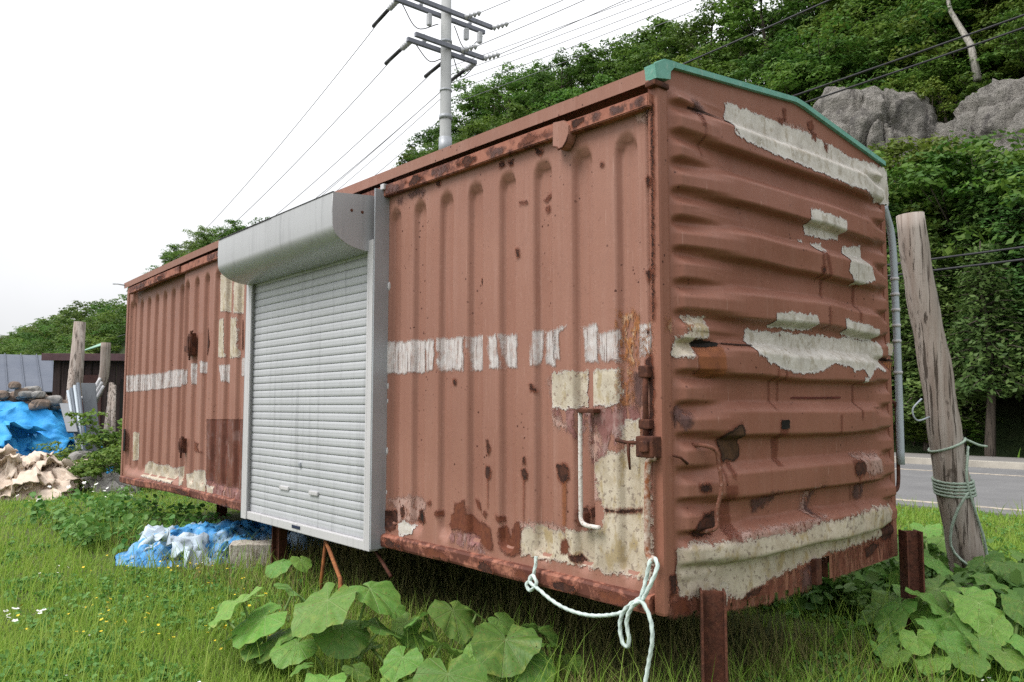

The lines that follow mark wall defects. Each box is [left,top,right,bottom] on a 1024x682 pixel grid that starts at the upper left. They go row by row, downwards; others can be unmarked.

peeling [724,102,889,206]
rust [592,96,656,436]
peeling [798,208,875,286]
peeling [666,315,710,359]
peeling [743,310,893,384]
peeling [133,432,214,493]
rust [194,419,243,506]
peeling [425,323,654,581]
rust [382,494,426,550]
rust [422,547,447,560]
rust [690,511,715,539]
peeling [675,503,893,600]